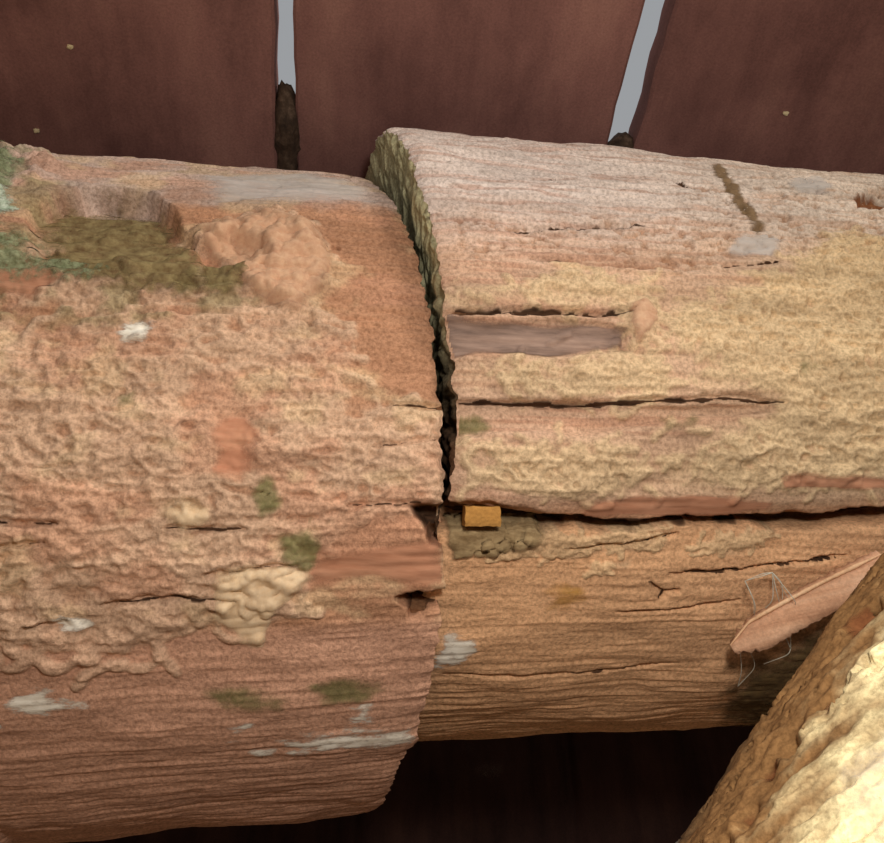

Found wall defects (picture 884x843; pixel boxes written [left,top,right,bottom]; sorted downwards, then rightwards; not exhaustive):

peeling [447,314,622,357]
crack [393,402,437,410]
crack [458,397,784,408]
crack [119,594,218,602]